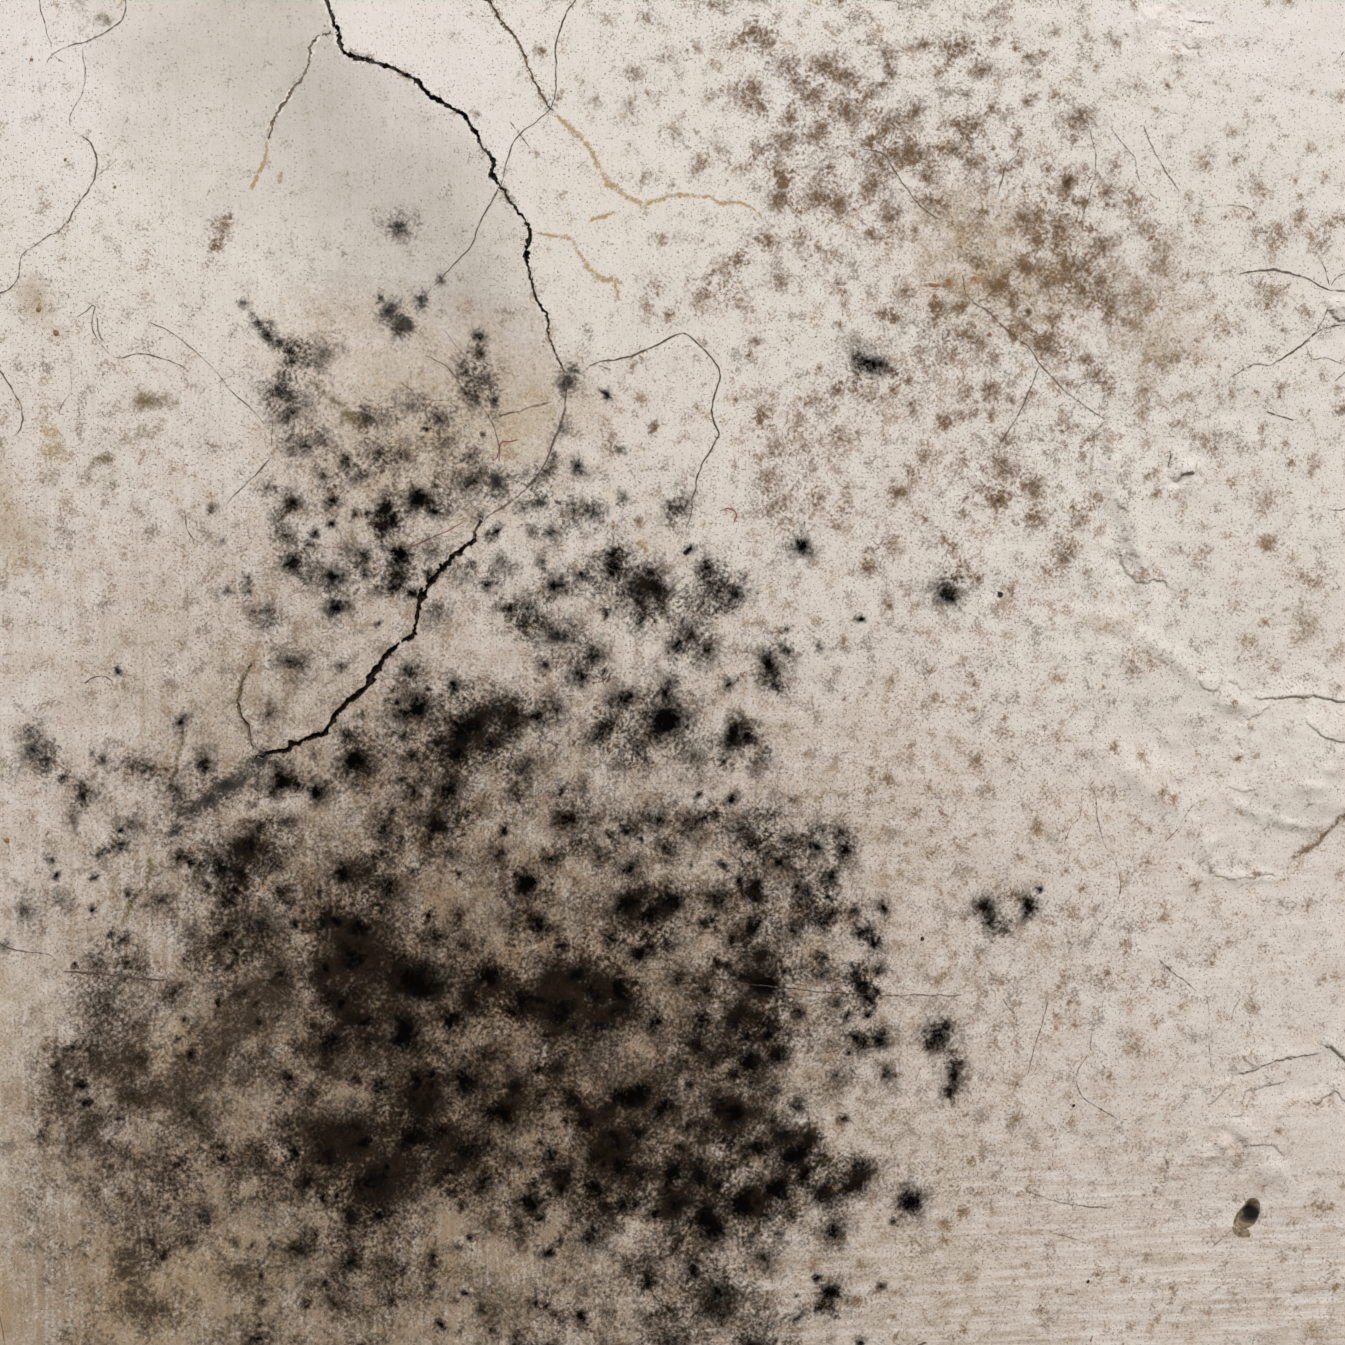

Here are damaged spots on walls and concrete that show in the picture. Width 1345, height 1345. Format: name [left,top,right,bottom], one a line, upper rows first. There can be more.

crack [0,0,126,294]
water stain [556,20,996,241]
crack [0,370,24,435]
crack [70,305,273,502]
water stain [240,301,390,456]
crack [236,0,721,759]
mould [805,167,1170,445]
water stain [264,408,615,621]
water stain [21,517,892,1345]
mould [963,887,1043,935]
mould [922,1020,965,1099]
peeling [1150,1023,1345,1238]